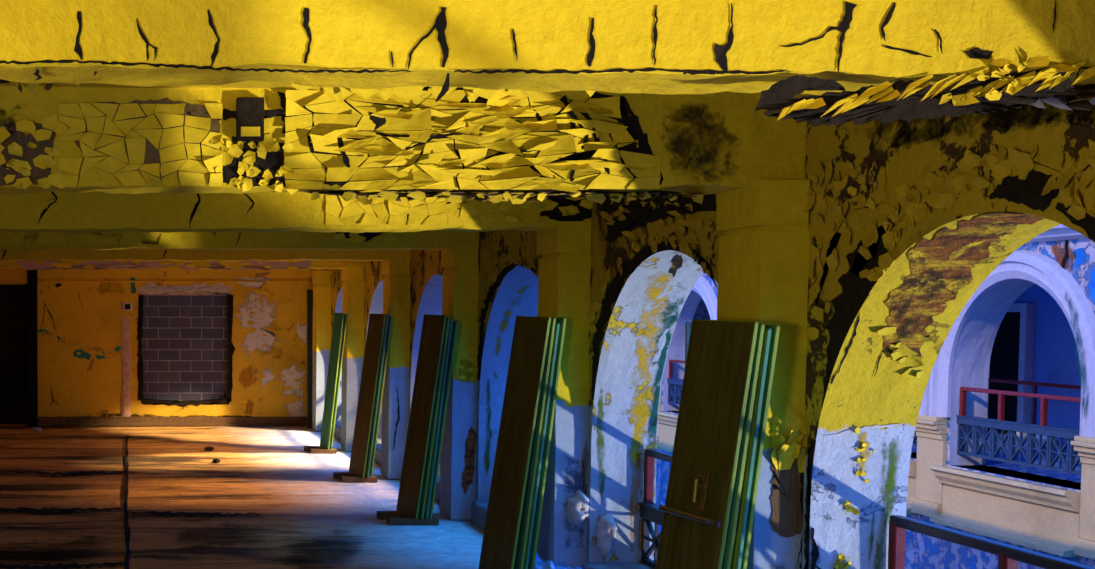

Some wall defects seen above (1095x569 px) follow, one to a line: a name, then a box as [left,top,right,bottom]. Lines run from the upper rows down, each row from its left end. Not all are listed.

crack [0,1,857,182]
crack [881,2,943,57]
peeling [755,47,1095,127]
damp [870,102,1095,146]
crack [37,192,58,225]
crack [189,128,254,246]
peeling [0,84,718,417]
spalling [804,139,1095,407]
crack [0,436,262,569]
spalling [770,440,816,569]
peeling [834,553,851,569]
peeling [844,500,861,515]